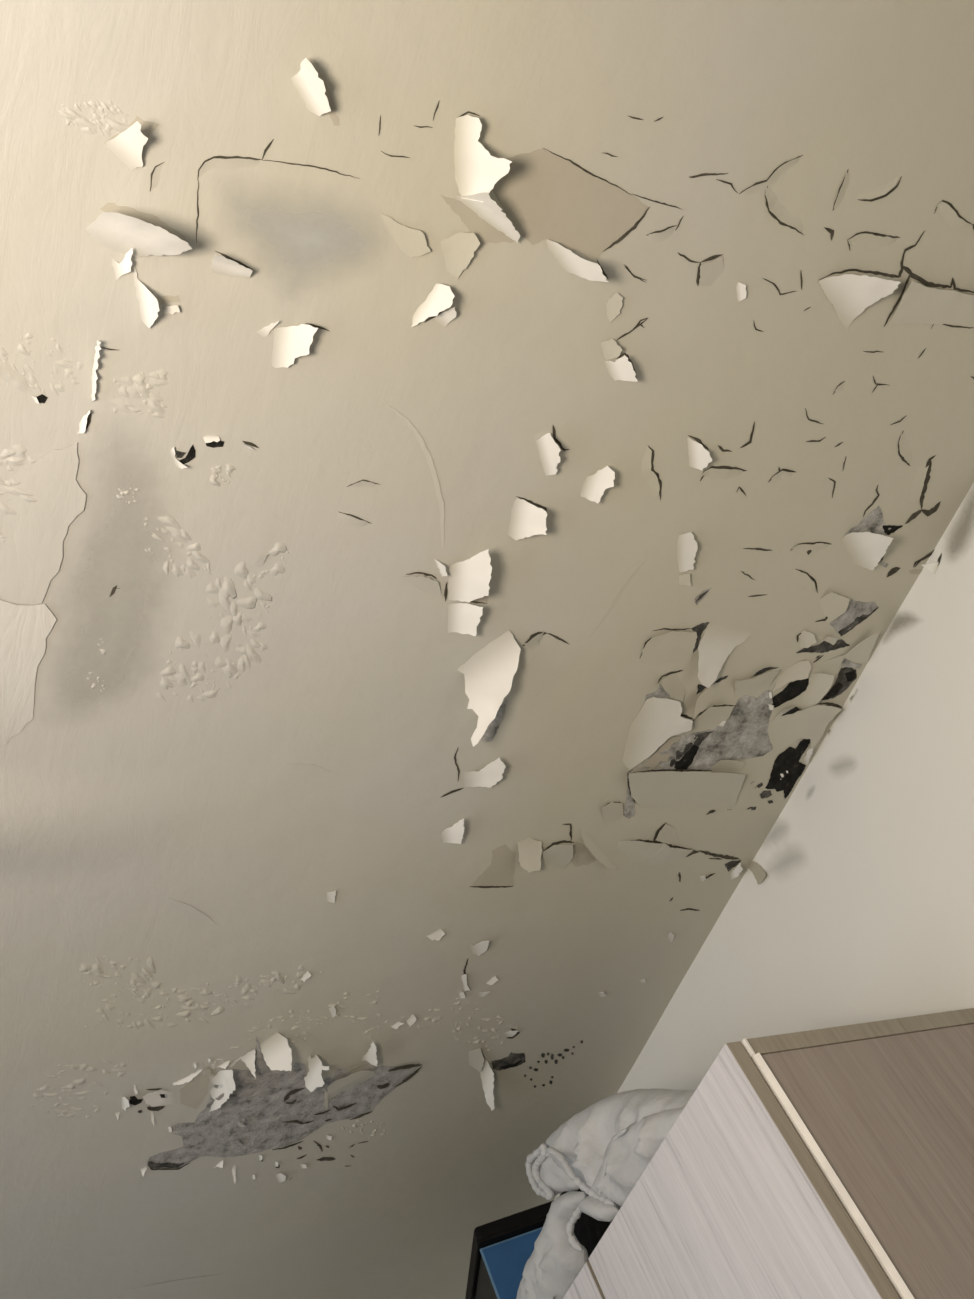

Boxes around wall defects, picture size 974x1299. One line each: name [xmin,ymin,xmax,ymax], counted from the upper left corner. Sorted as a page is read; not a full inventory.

peeling [86,203,192,328]
crack [196,140,360,243]
peeling [256,321,329,368]
peeling [381,111,683,327]
crack [617,318,648,340]
crack [646,217,810,332]
crack [690,155,974,287]
crack [805,409,846,497]
crack [891,416,941,524]
peeling [442,549,521,797]
spalling [602,592,880,824]
spalling [115,1032,422,1183]